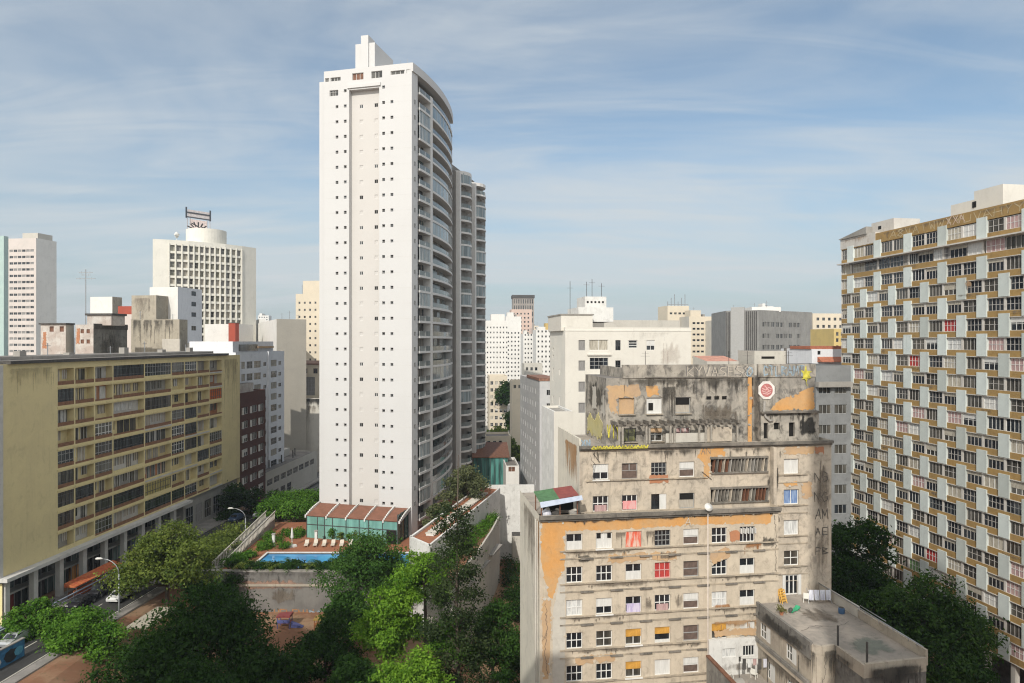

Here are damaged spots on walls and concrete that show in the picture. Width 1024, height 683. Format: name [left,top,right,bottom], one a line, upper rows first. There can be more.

peeling [586,384,661,440]
leakage [624,378,743,413]
leakage [703,405,736,420]
leakage [766,413,816,435]
peeling [771,387,815,411]
peeling [697,448,726,479]
peeling [539,513,772,679]